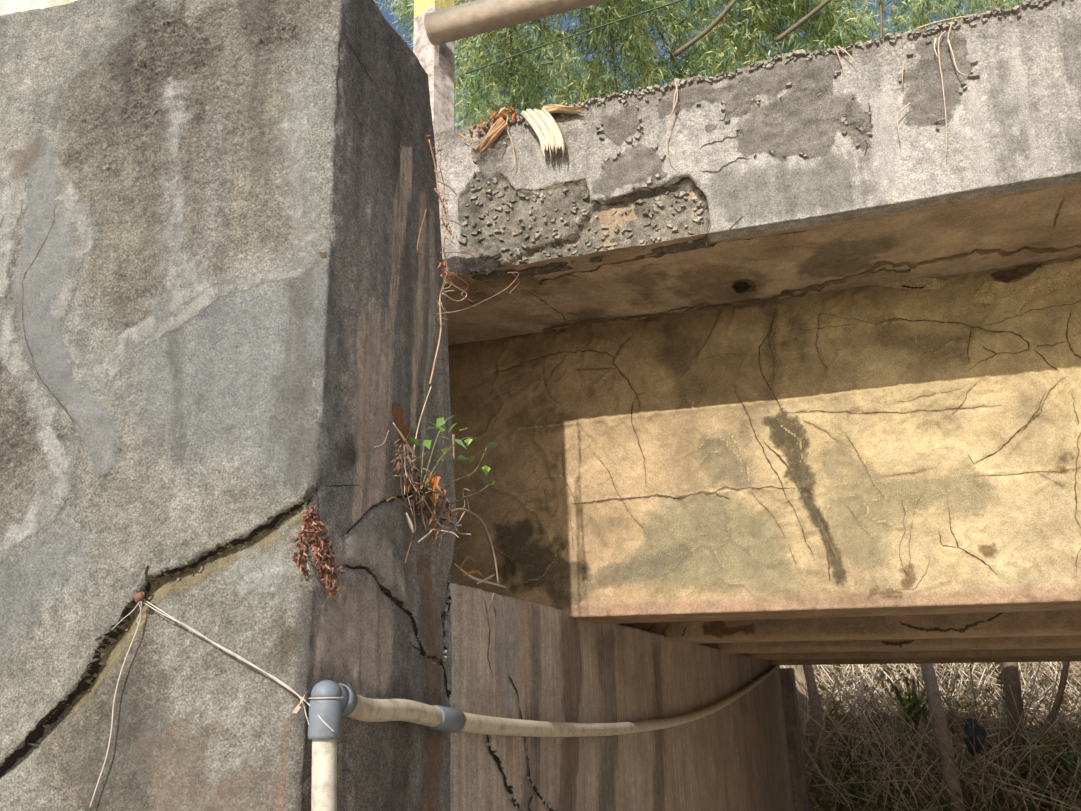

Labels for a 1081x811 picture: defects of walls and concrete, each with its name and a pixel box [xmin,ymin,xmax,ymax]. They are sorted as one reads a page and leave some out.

spalling [458,54,873,275]
crack [22,203,86,435]
crack [490,199,1081,593]
leakage [764,409,846,584]
crack [0,484,412,777]
crack [343,564,451,700]
crack [485,601,559,811]